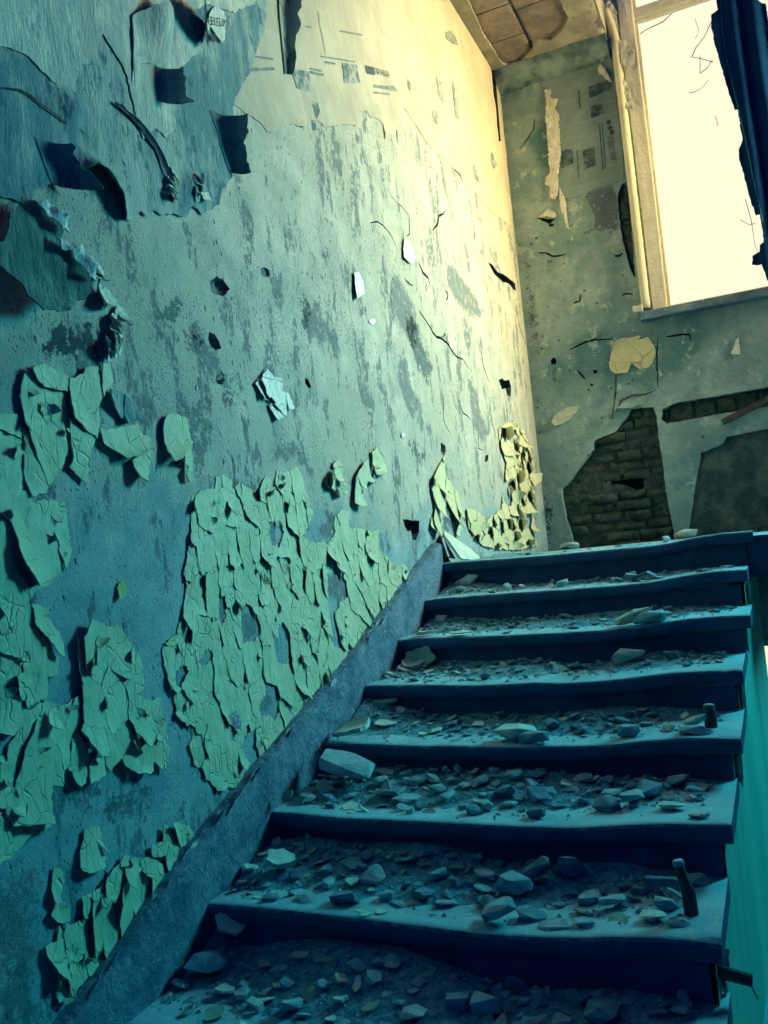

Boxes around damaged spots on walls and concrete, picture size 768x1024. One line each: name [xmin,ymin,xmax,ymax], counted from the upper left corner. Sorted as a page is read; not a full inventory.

crack [370,189,445,245]
spalling [210,276,230,296]
crack [391,264,448,306]
crack [419,311,490,382]
peeling [609,335,656,374]
crack [612,333,692,419]
peeling [551,405,579,426]
peeling [431,422,543,550]
flaking render [561,387,768,549]
peeling [0,361,412,864]
spalling [331,706,457,742]
peeling [45,822,199,1004]